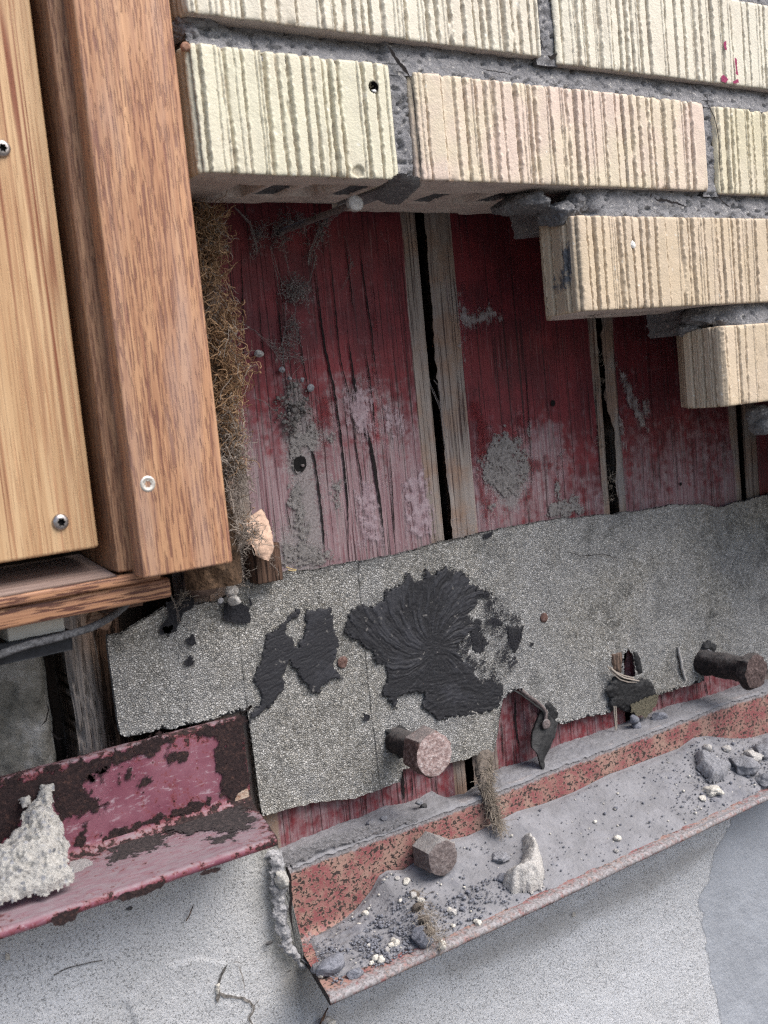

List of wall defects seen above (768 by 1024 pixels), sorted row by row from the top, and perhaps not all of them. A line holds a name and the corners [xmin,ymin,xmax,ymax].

peeling [281,542,341,567]
peeling [18,795,31,808]
rust [0,715,263,869]
rust [114,881,166,901]
rust [51,906,81,926]